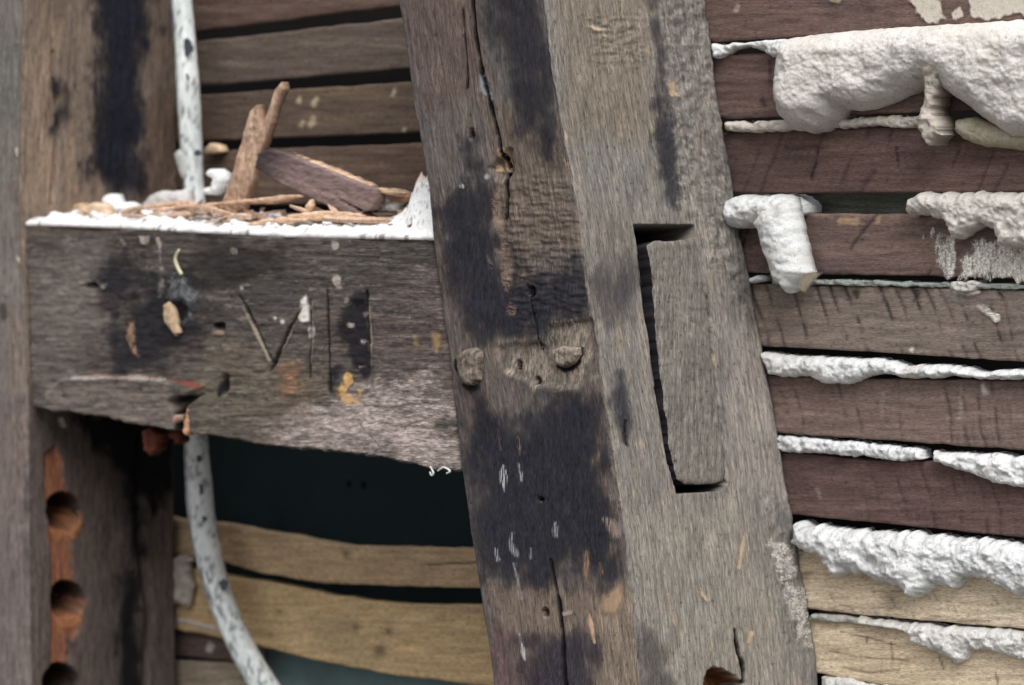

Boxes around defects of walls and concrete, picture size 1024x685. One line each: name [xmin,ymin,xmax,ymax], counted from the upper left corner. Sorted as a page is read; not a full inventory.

damp [50,78,69,133]
damp [79,0,151,194]
crack [462,0,513,219]
damp [432,136,632,346]
damp [284,291,630,613]
crack [550,559,569,685]